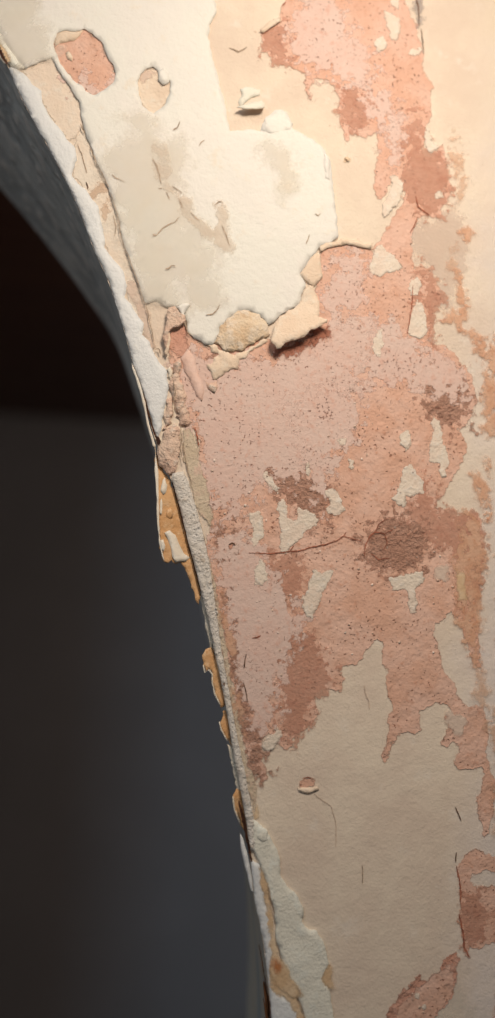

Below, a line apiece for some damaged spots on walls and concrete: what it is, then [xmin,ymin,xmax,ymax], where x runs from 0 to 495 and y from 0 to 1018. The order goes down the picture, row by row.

peeling [138,68,170,114]
peeling [0,30,161,354]
peeling [162,0,495,837]
crack [259,519,393,560]
peeling [386,848,495,1018]